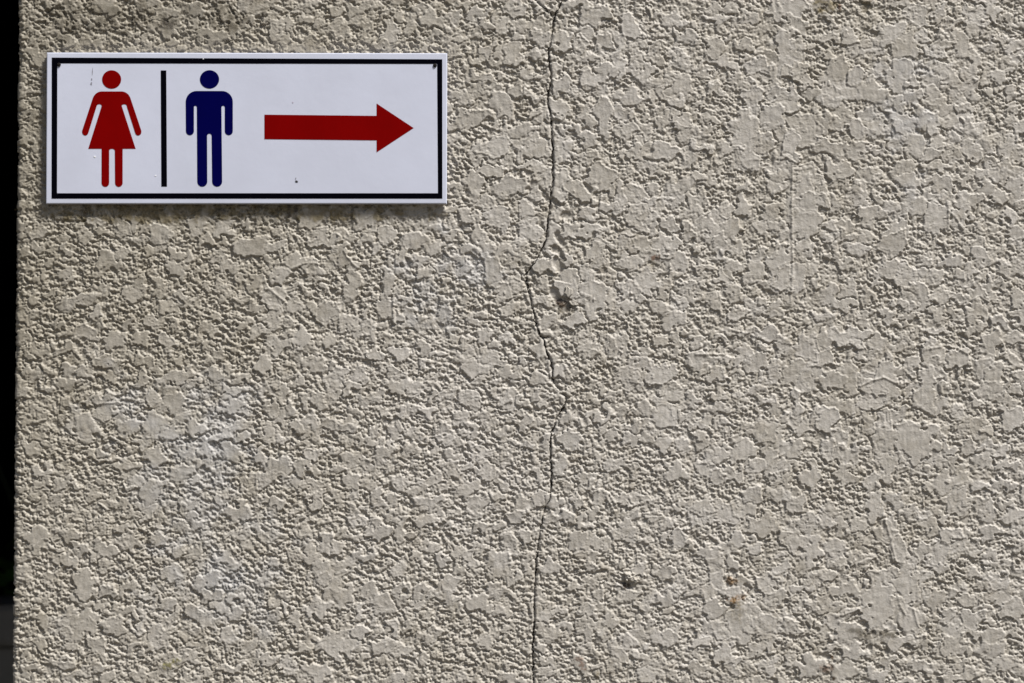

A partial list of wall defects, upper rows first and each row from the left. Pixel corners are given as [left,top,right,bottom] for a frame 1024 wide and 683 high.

crack [525,0,567,683]